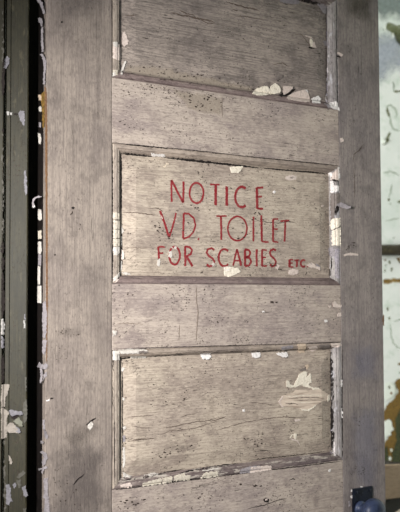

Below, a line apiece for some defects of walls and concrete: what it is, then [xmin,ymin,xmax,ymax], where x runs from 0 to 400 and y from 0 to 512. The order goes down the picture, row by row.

peeling [112,22,340,113]
peeling [321,167,358,279]
peeling [224,267,241,277]
peeling [1,384,27,444]
peeling [112,349,236,488]
peeling [278,365,330,411]
peeling [385,419,394,437]
peeling [384,382,396,400]
peeling [3,455,28,511]